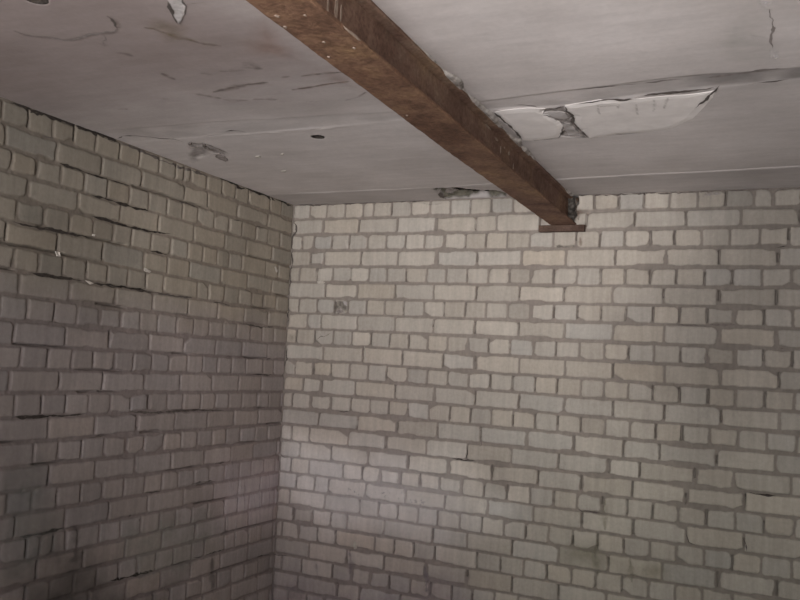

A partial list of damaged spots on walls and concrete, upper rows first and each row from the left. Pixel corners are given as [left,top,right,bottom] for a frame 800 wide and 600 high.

crack [18,17,117,45]
flaking render [167,0,203,24]
crack [766,9,776,48]
flaking render [490,91,715,142]